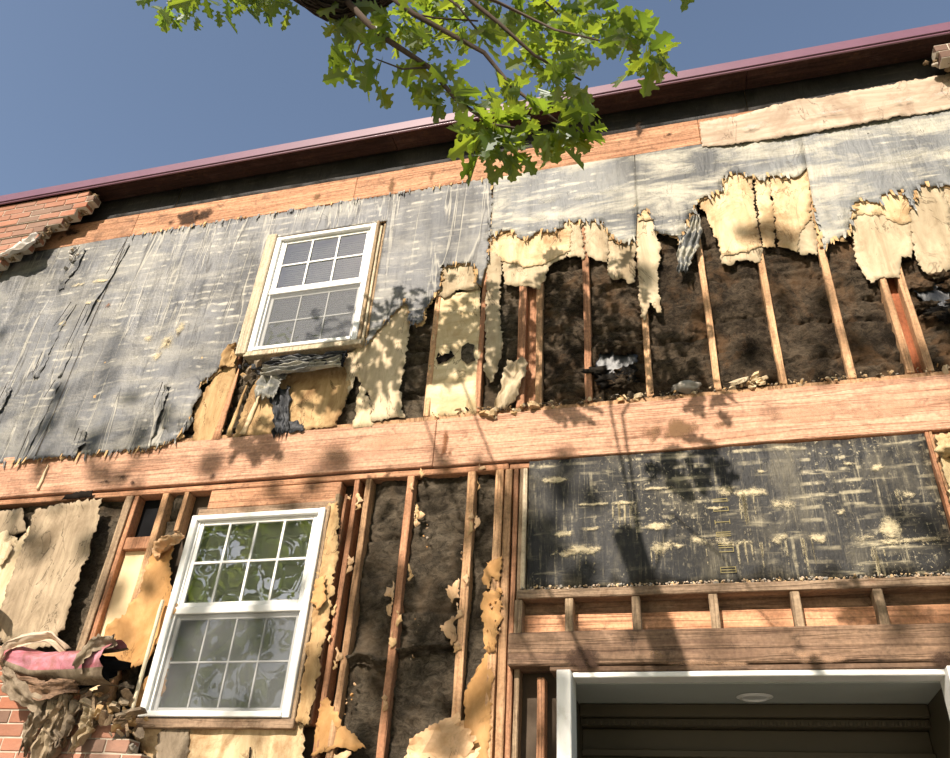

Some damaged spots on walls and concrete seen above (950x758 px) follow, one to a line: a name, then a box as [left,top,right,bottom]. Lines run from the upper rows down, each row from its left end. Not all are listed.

peeling [698,169,818,266]
peeling [851,186,950,283]
peeling [438,204,662,383]
peeling [192,359,275,441]
peeling [279,302,410,433]
peeling [0,498,102,649]
damp [553,531,600,562]
damp [580,501,670,533]
damp [692,535,788,564]
damp [721,487,791,523]
damp [800,534,825,574]
peeling [122,500,340,758]